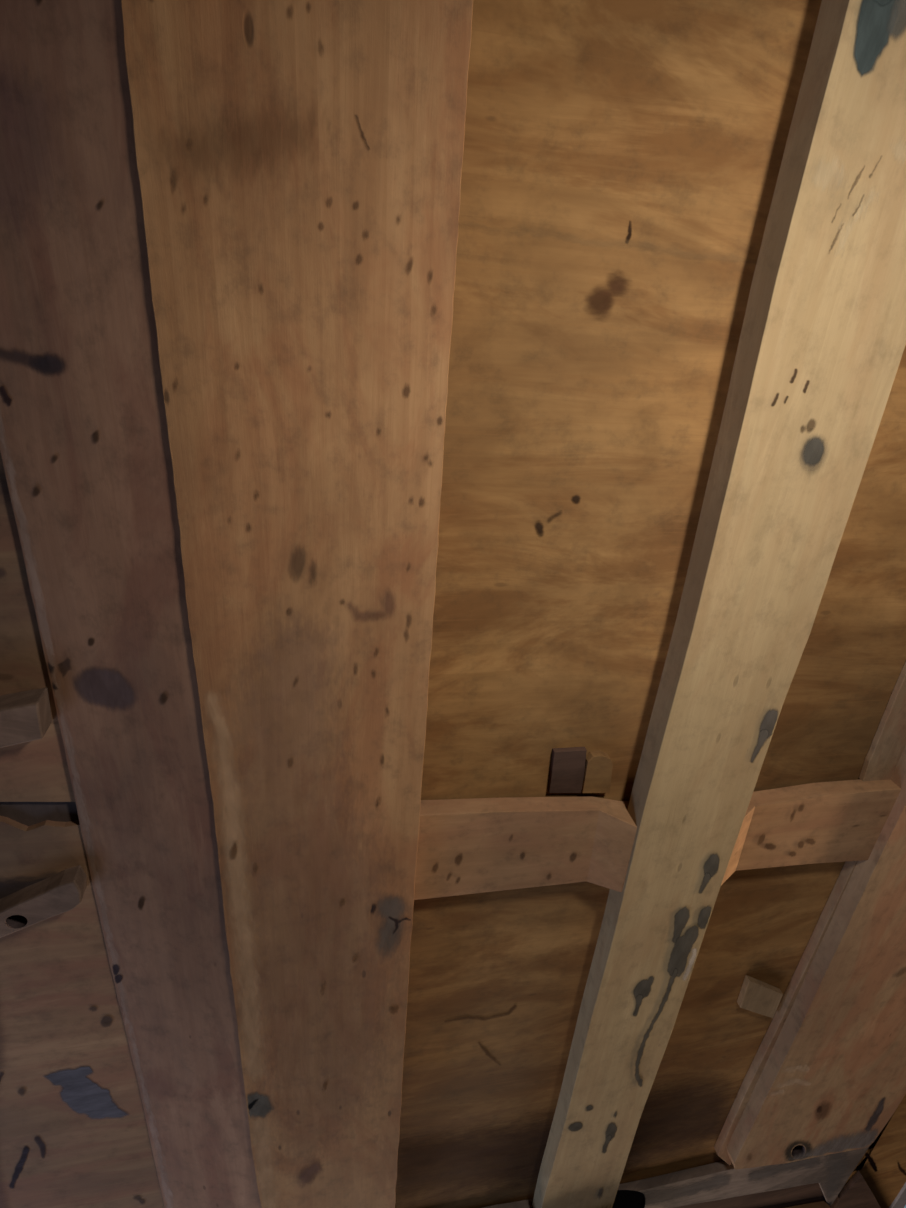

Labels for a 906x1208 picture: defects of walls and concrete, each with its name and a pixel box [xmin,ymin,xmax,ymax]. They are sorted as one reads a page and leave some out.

leakage [854,0,906,76]
leakage [590,277,625,313]
leakage [0,350,64,374]
leakage [801,420,824,465]
leakage [75,669,134,708]
leakage [750,710,778,763]
leakage [633,853,719,1087]